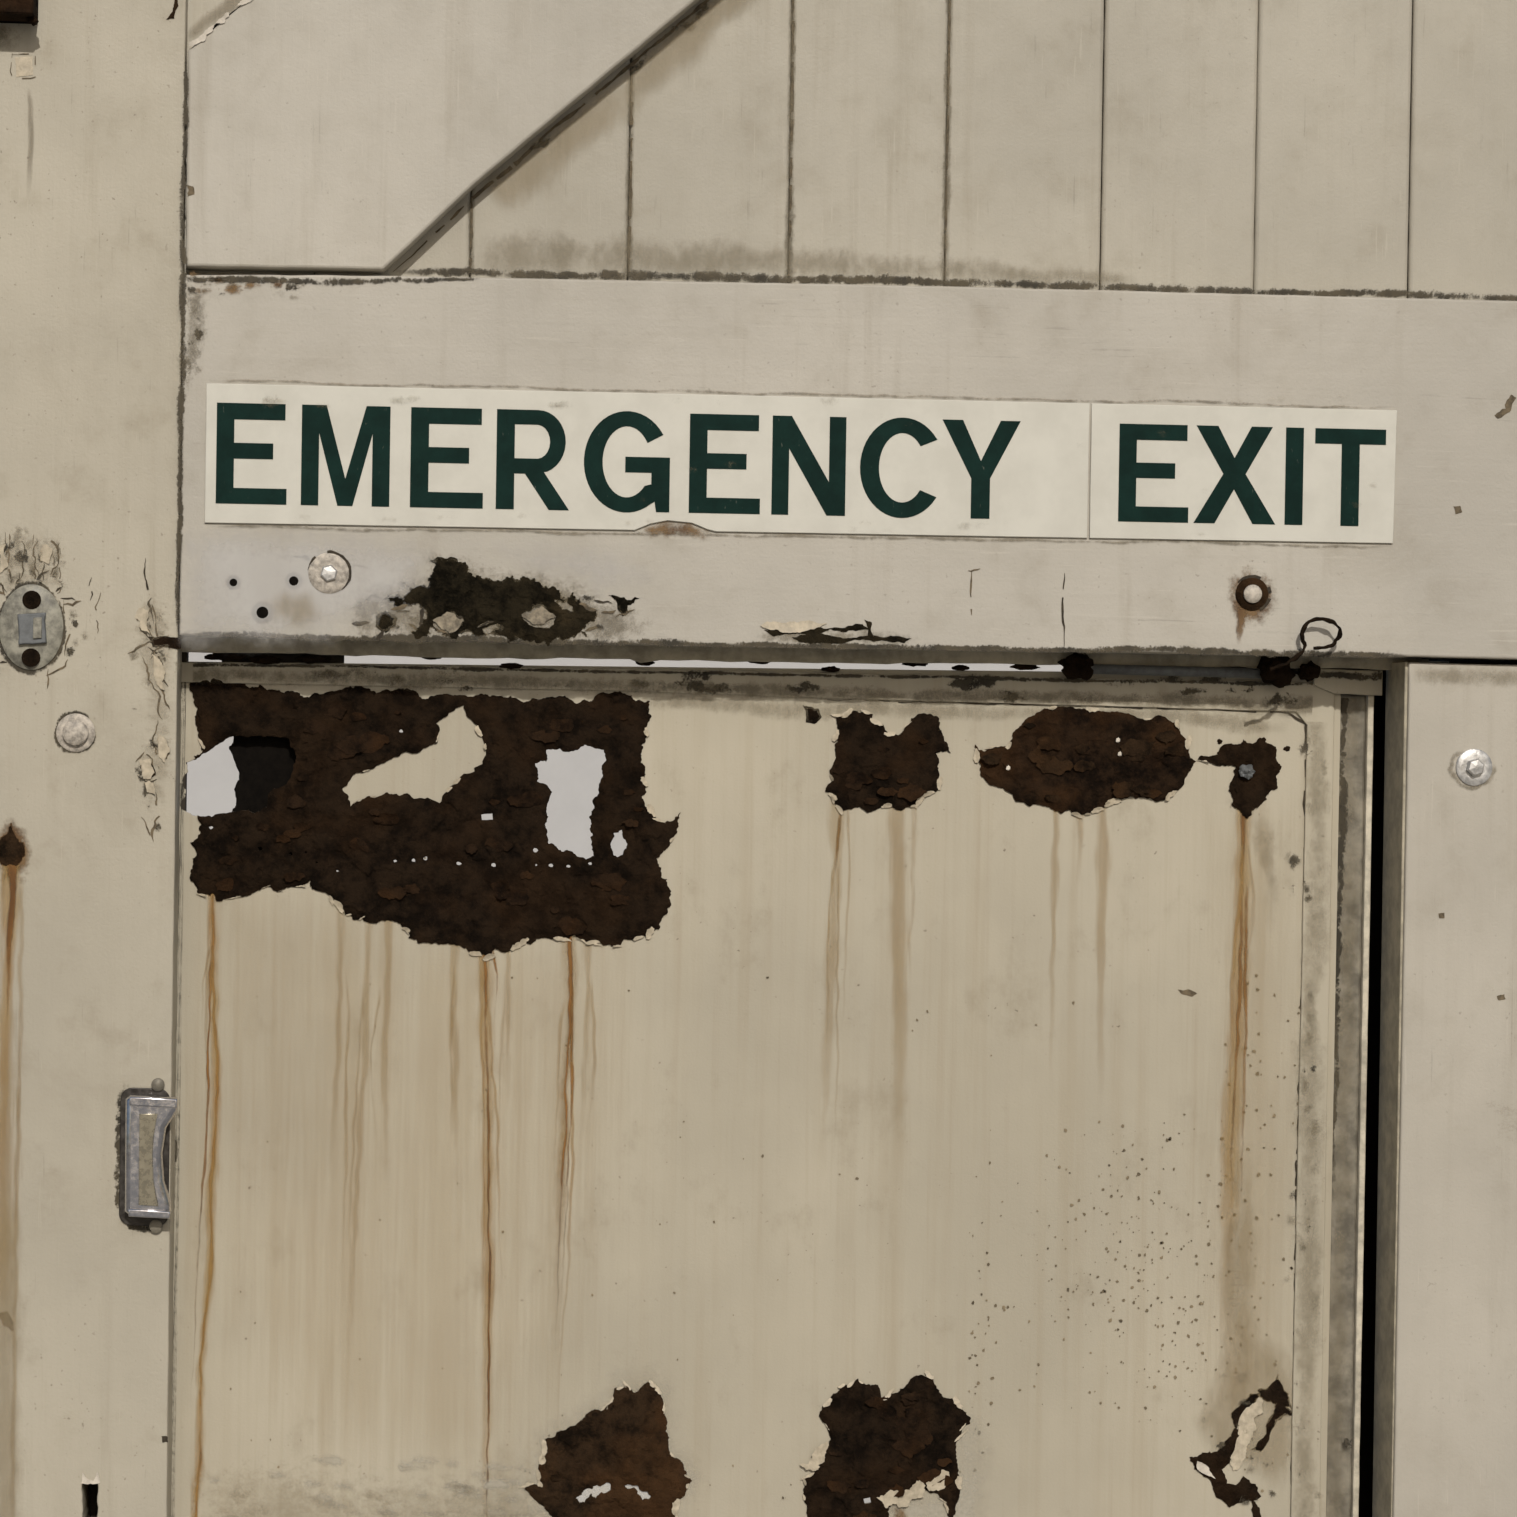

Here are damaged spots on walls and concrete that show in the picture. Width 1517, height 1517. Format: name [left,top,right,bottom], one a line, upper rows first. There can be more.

corrosion [1232,575,1272,635]
corrosion [0,823,28,972]
corrosion [973,706,1290,1112]
corrosion [189,678,680,1406]
peeling [1190,1375,1292,1517]